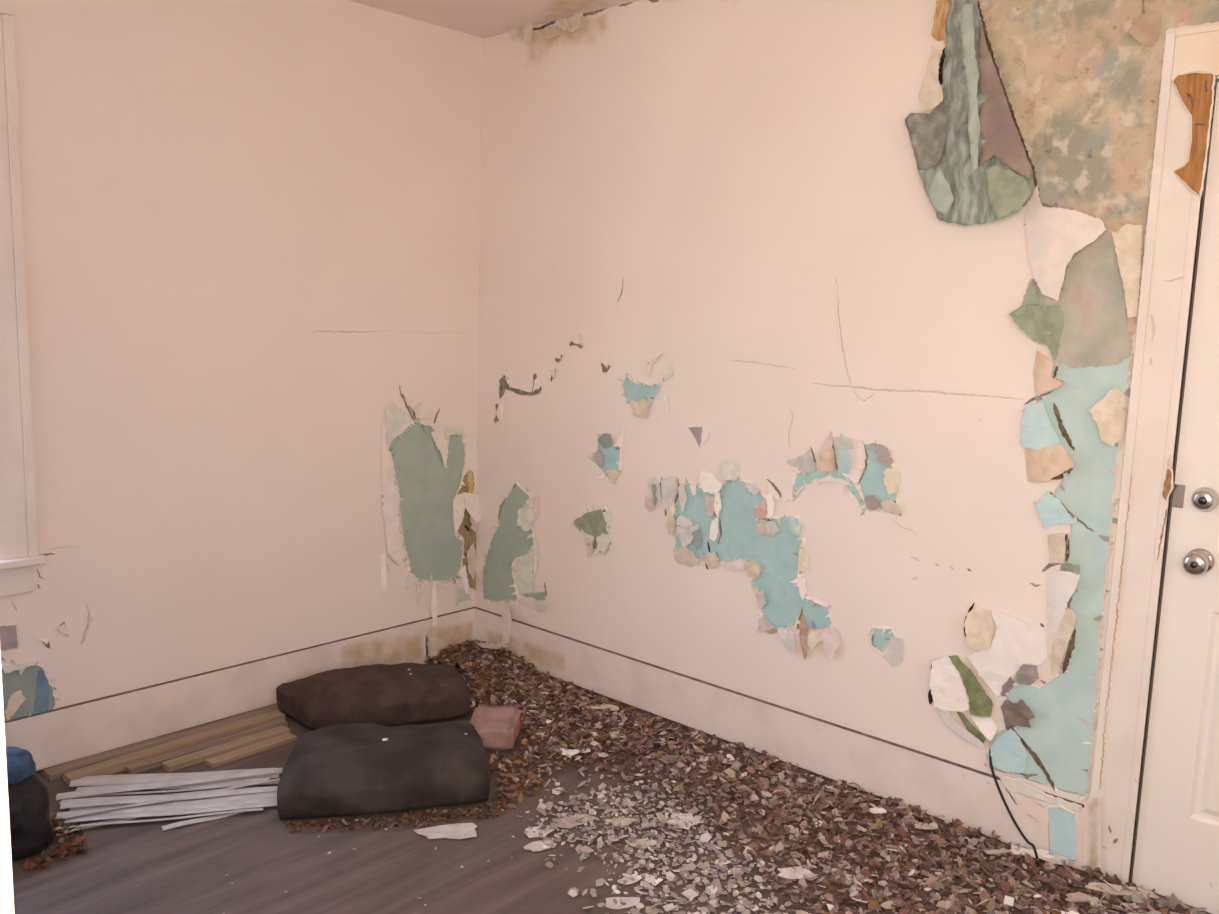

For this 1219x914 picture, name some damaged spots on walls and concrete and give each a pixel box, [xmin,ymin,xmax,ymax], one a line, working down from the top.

damp [523,0,614,73]
peeling [589,426,624,485]
peeling [600,353,673,419]
crack [730,276,1093,572]
peeling [380,385,549,659]
peeling [570,506,613,559]
peeling [645,432,917,660]
peeling [0,623,62,721]
crack [926,664,934,704]
crack [1061,595,1076,673]
crack [1099,477,1132,789]
crack [1011,728,1055,790]